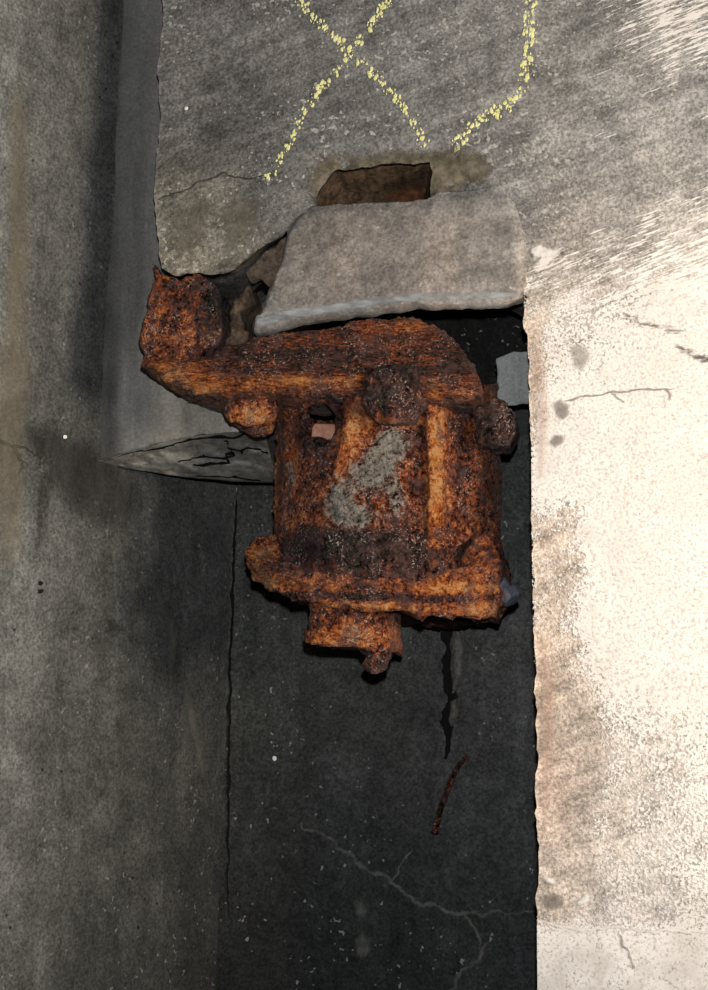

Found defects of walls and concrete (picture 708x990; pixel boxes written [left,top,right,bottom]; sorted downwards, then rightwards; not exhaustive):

spalling [159,170,291,314]
crack [0,440,37,478]
crack [567,388,674,403]
crack [226,500,237,918]
corrosion [359,649,392,675]
crack [439,628,468,760]